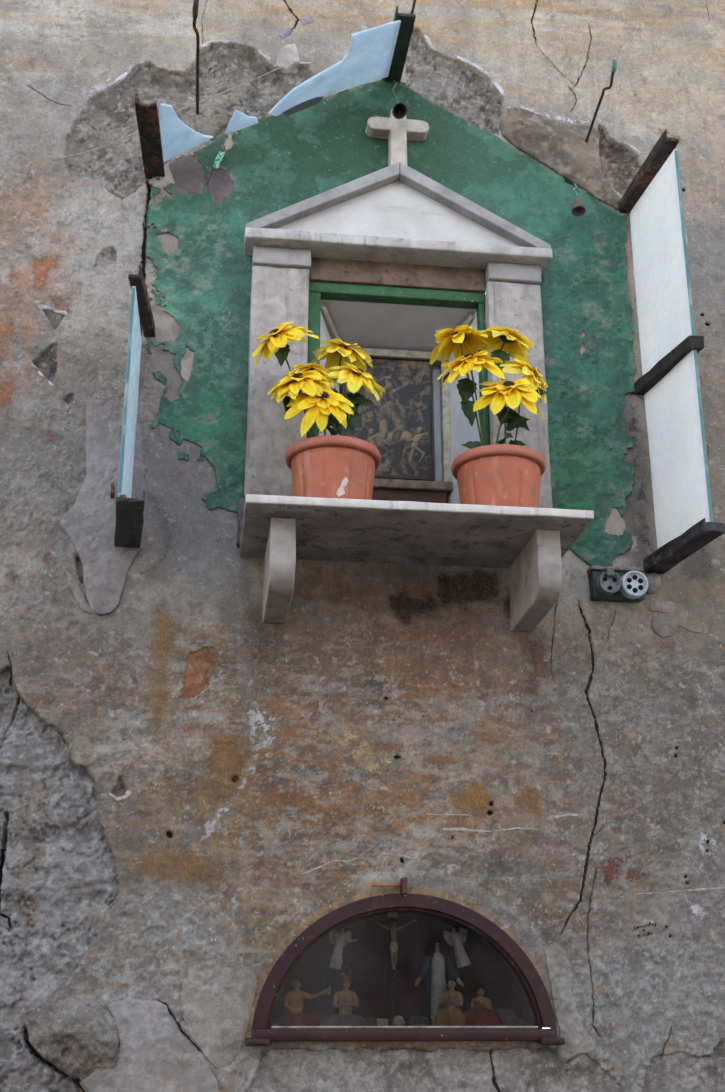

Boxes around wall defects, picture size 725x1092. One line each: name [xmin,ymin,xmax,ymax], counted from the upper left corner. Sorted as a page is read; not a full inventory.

flaking render [66,15,314,205]
crack [283,0,299,30]
flaking render [405,31,504,135]
crack [531,0,592,111]
flaking render [597,117,642,195]
peeling [156,232,180,255]
peeling [141,305,195,403]
peeling [605,508,638,551]
spalling [181,647,219,699]
flaking render [108,777,132,801]
crack [550,600,616,1041]
spalling [0,669,118,1092]